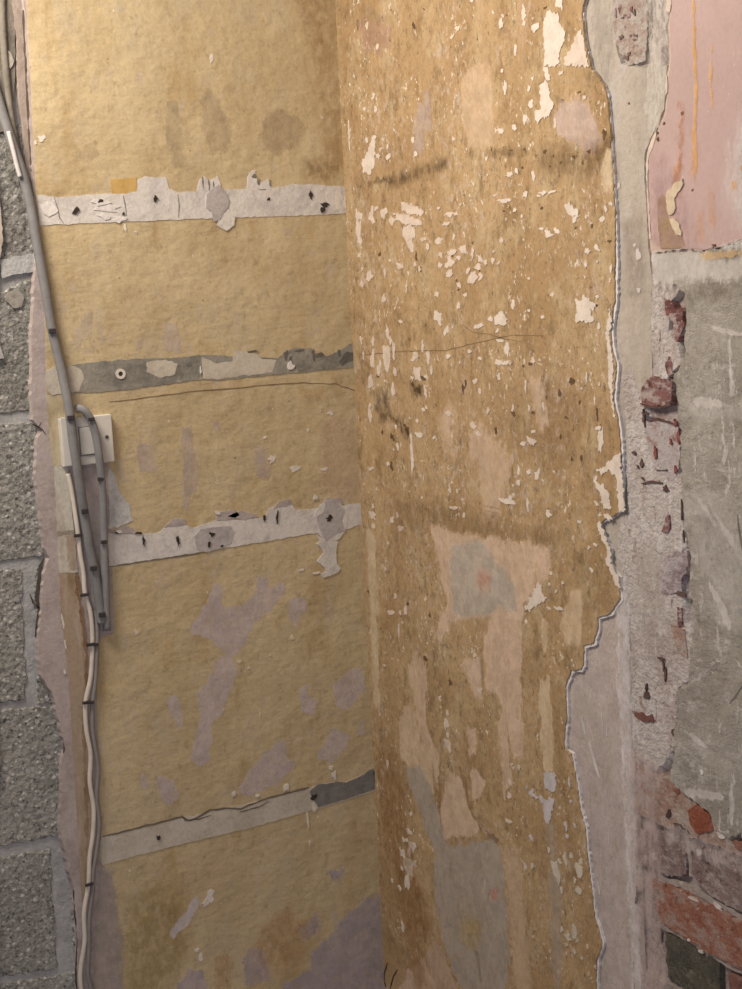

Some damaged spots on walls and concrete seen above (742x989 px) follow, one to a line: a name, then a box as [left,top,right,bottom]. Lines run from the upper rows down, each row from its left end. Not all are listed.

peeling [497,0,589,134]
flaking render [612,0,653,66]
peeling [361,135,391,175]
peeling [356,202,504,310]
peeling [359,320,403,396]
peeling [381,340,455,478]
peeling [473,299,541,380]
flaking render [520,295,682,588]
flaking render [664,298,687,343]
flaking render [661,499,691,658]
crack [102,787,309,837]
flaking render [635,763,742,989]